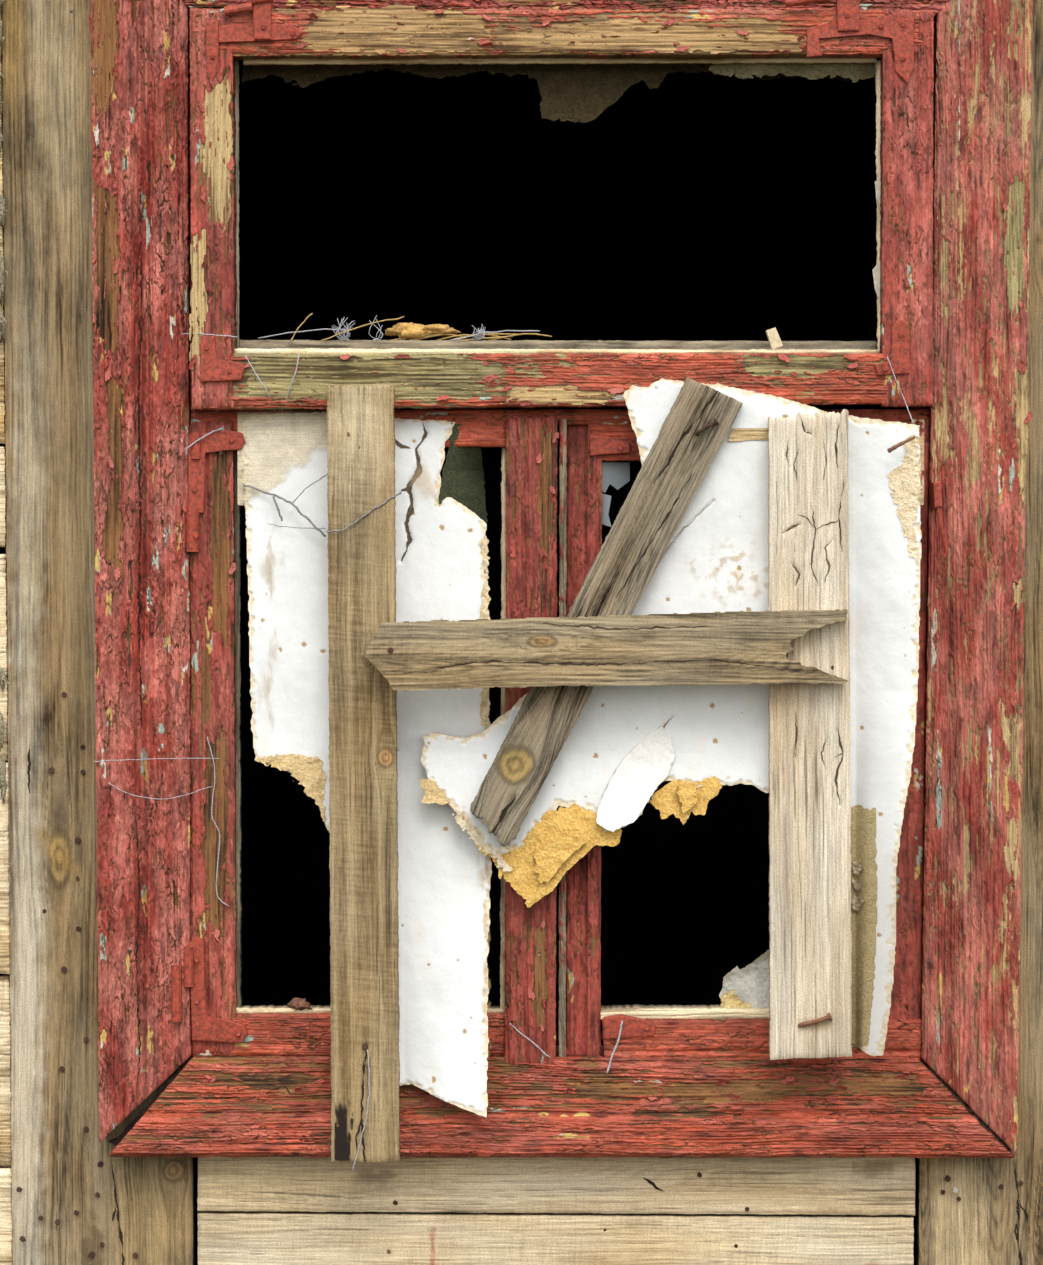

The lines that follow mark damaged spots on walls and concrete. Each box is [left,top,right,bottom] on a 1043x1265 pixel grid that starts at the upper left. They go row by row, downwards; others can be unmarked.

peeling [295,0,807,54]
peeling [189,71,234,370]
peeling [1003,172,1028,325]
peeling [92,180,124,580]
peeling [243,354,625,406]
peeling [736,354,858,378]
crack [395,425,427,561]
crack [616,391,718,598]
peeling [887,435,922,565]
crack [404,658,785,674]
crack [537,622,706,630]
peeling [201,731,231,941]